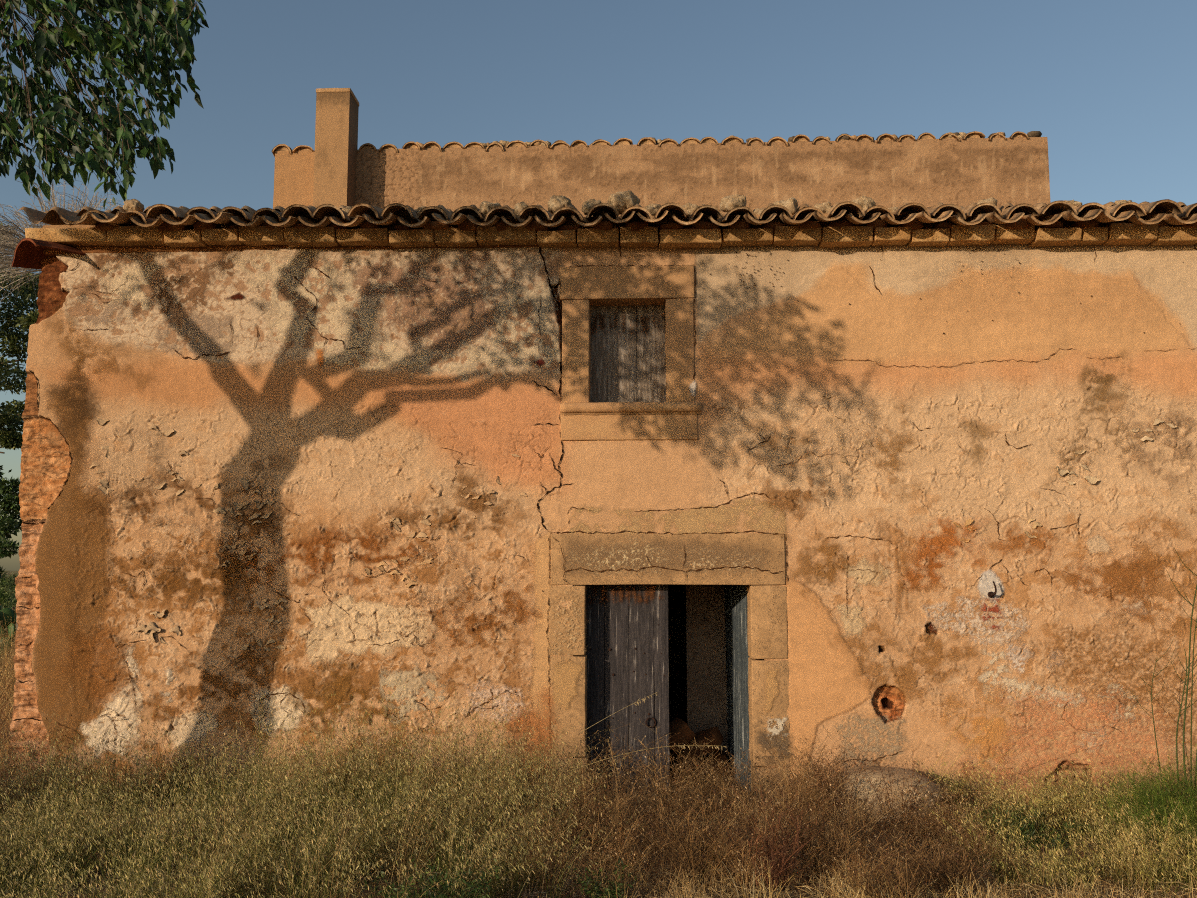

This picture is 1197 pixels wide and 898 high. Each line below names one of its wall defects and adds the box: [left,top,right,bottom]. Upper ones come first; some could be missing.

spalling [34,256,69,324]
crack [175,324,259,359]
crack [294,266,359,350]
crack [749,434,858,466]
crack [447,247,788,753]
spalling [7,372,72,779]
water stain [69,490,110,723]
flaking render [299,595,437,664]
flaking render [81,646,142,757]
crack [384,690,520,723]
spalling [872,685,905,723]
flaking render [924,570,1136,803]